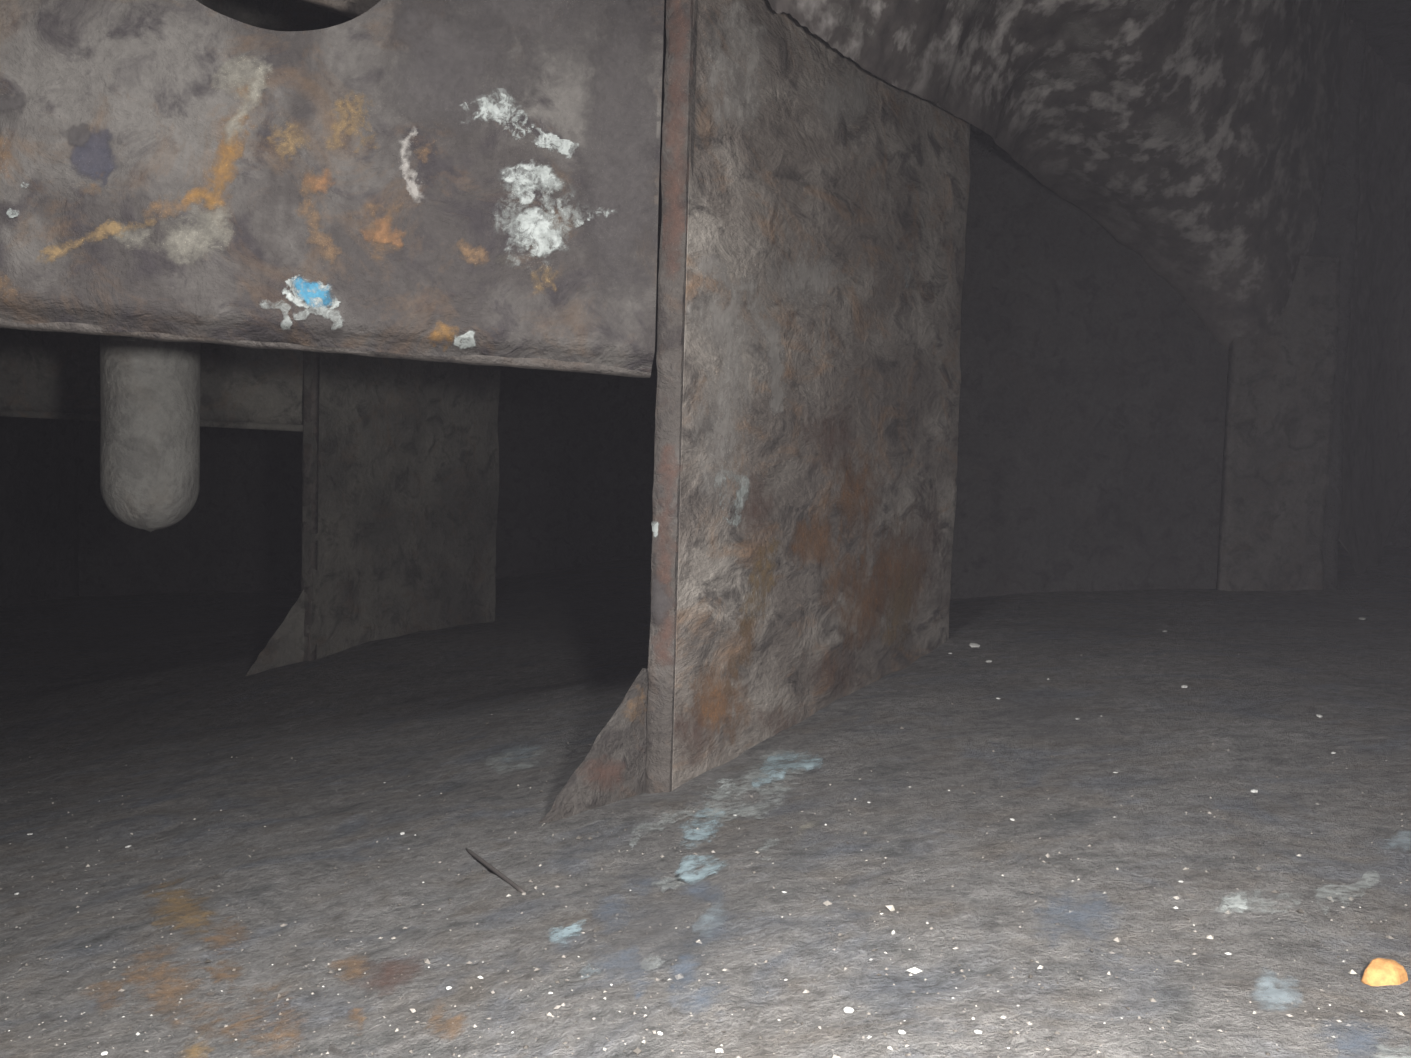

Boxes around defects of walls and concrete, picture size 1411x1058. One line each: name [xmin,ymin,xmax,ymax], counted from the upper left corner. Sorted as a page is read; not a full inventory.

corrosion [152,66,263,217]
leakage [394,0,660,291]
peeling [262,276,342,330]
corrosion [651,578,671,623]